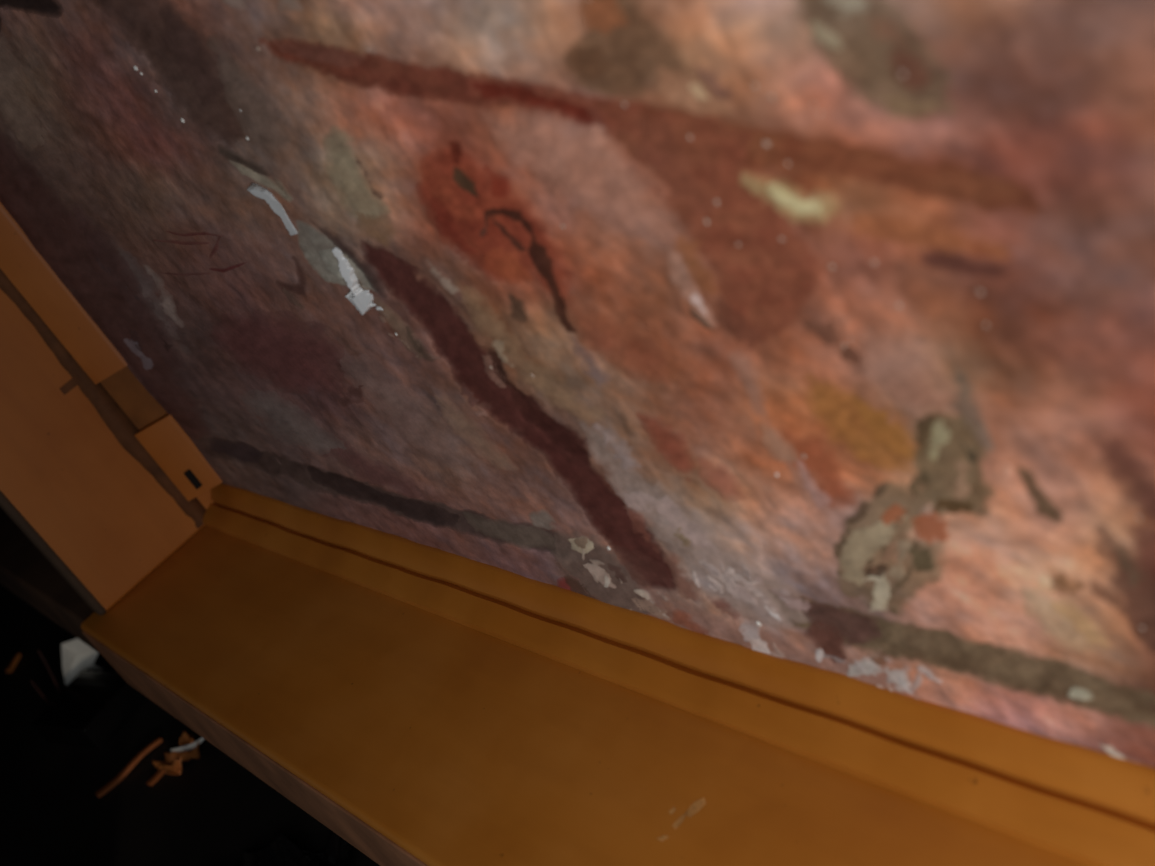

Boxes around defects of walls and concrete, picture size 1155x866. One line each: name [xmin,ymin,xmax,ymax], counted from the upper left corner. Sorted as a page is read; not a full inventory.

peeling [217,143,441,362]
flaking render [549,530,669,618]
peeling [832,363,997,617]